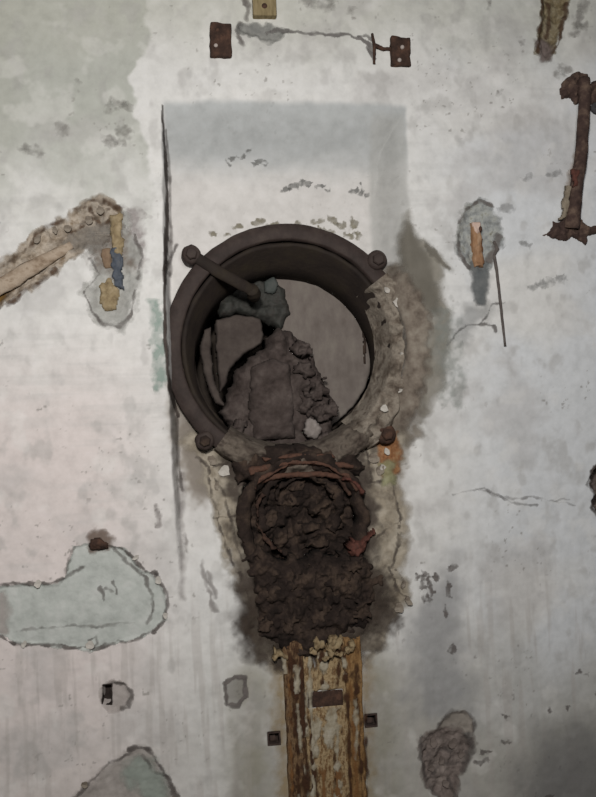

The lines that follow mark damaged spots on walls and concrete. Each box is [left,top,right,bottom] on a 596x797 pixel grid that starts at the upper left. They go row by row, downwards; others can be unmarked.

crack [266,28,373,59]
spalling [83,210,143,329]
spalling [456,198,504,271]
leakage [341,225,450,449]
rust [377,436,403,486]
peeling [0,543,169,653]
spalling [101,681,133,712]
spalling [223,675,248,708]
rust [276,647,369,797]
peeling [75,746,180,797]